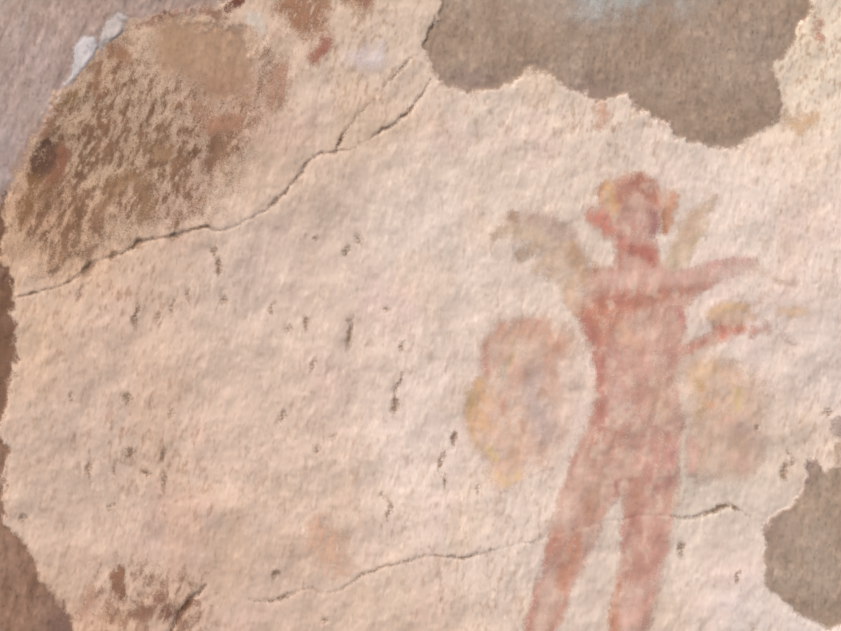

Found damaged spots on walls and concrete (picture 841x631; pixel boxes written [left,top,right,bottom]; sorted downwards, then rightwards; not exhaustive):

leakage [1,0,400,291]
crack [18,17,436,298]
flaking render [0,0,232,631]
crack [170,584,207,631]
crack [265,534,551,603]
crack [671,502,750,520]